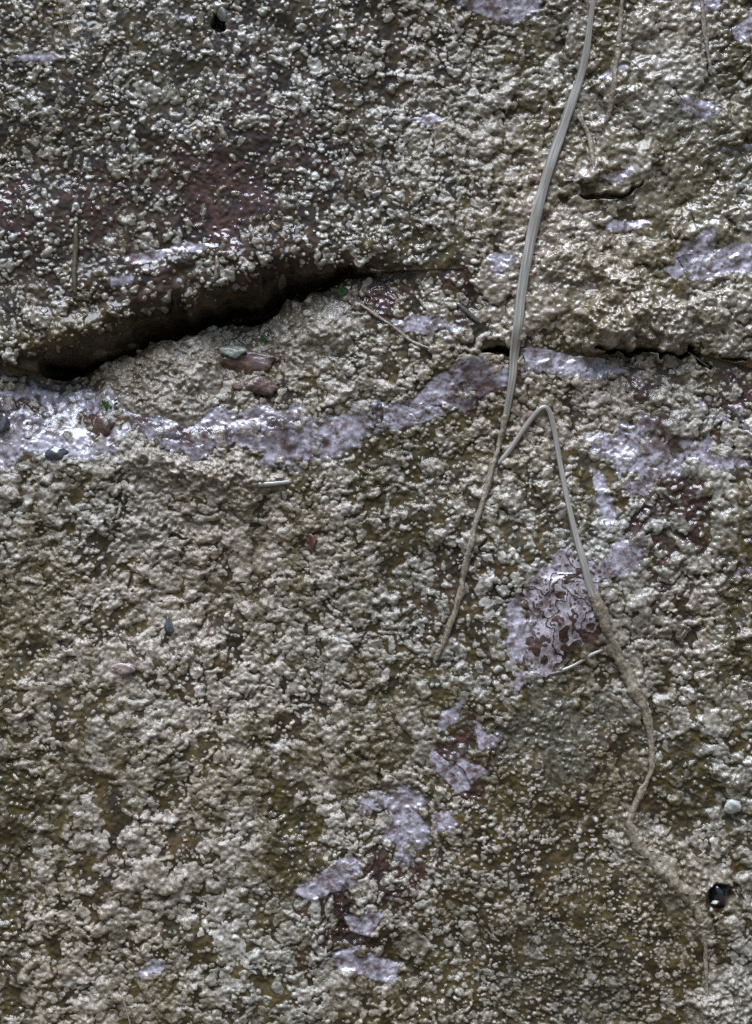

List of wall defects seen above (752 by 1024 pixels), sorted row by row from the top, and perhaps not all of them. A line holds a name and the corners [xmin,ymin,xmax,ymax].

crack [38,263,381,381]
crack [484,348,510,357]
crack [678,350,742,369]